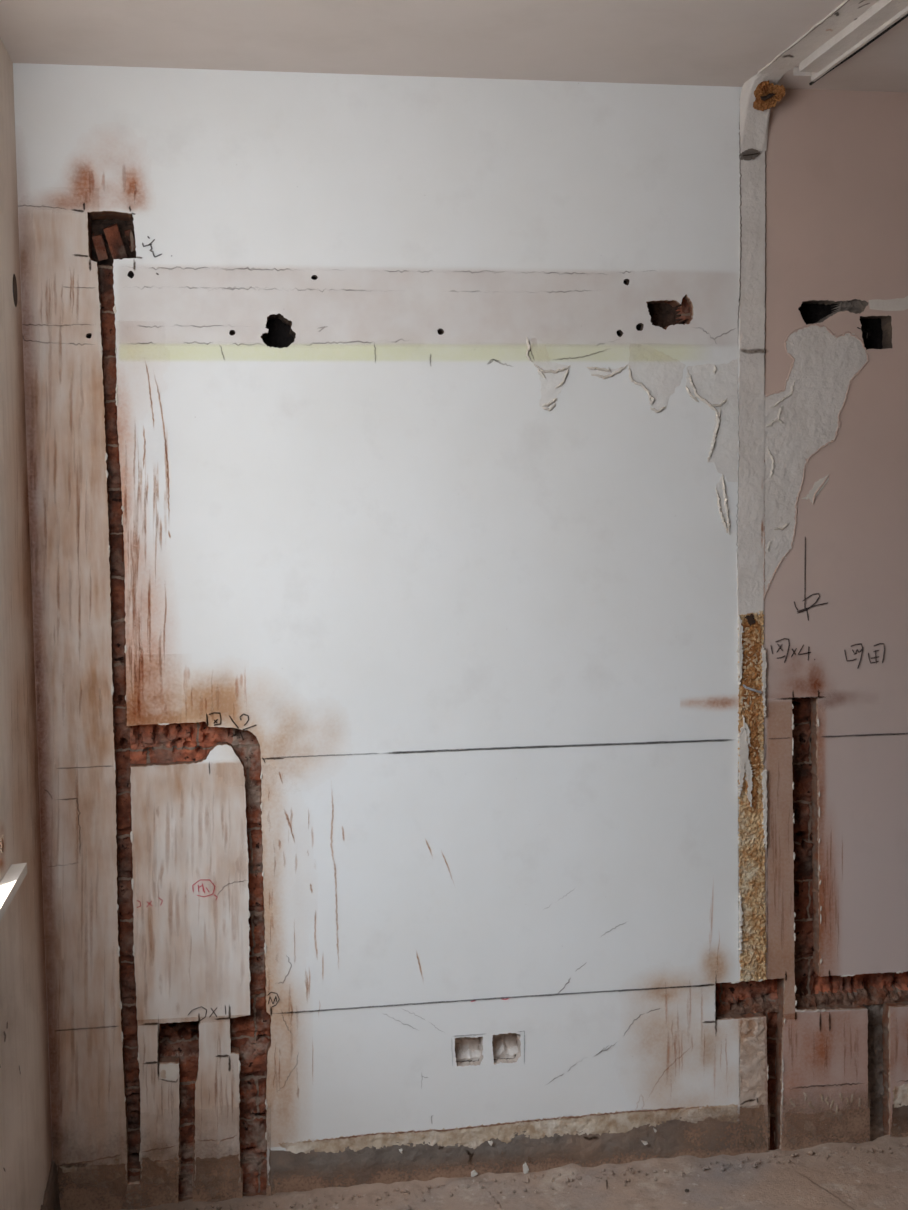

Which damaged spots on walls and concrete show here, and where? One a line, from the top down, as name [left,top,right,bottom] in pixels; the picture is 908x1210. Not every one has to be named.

peeling [763,299,869,600]